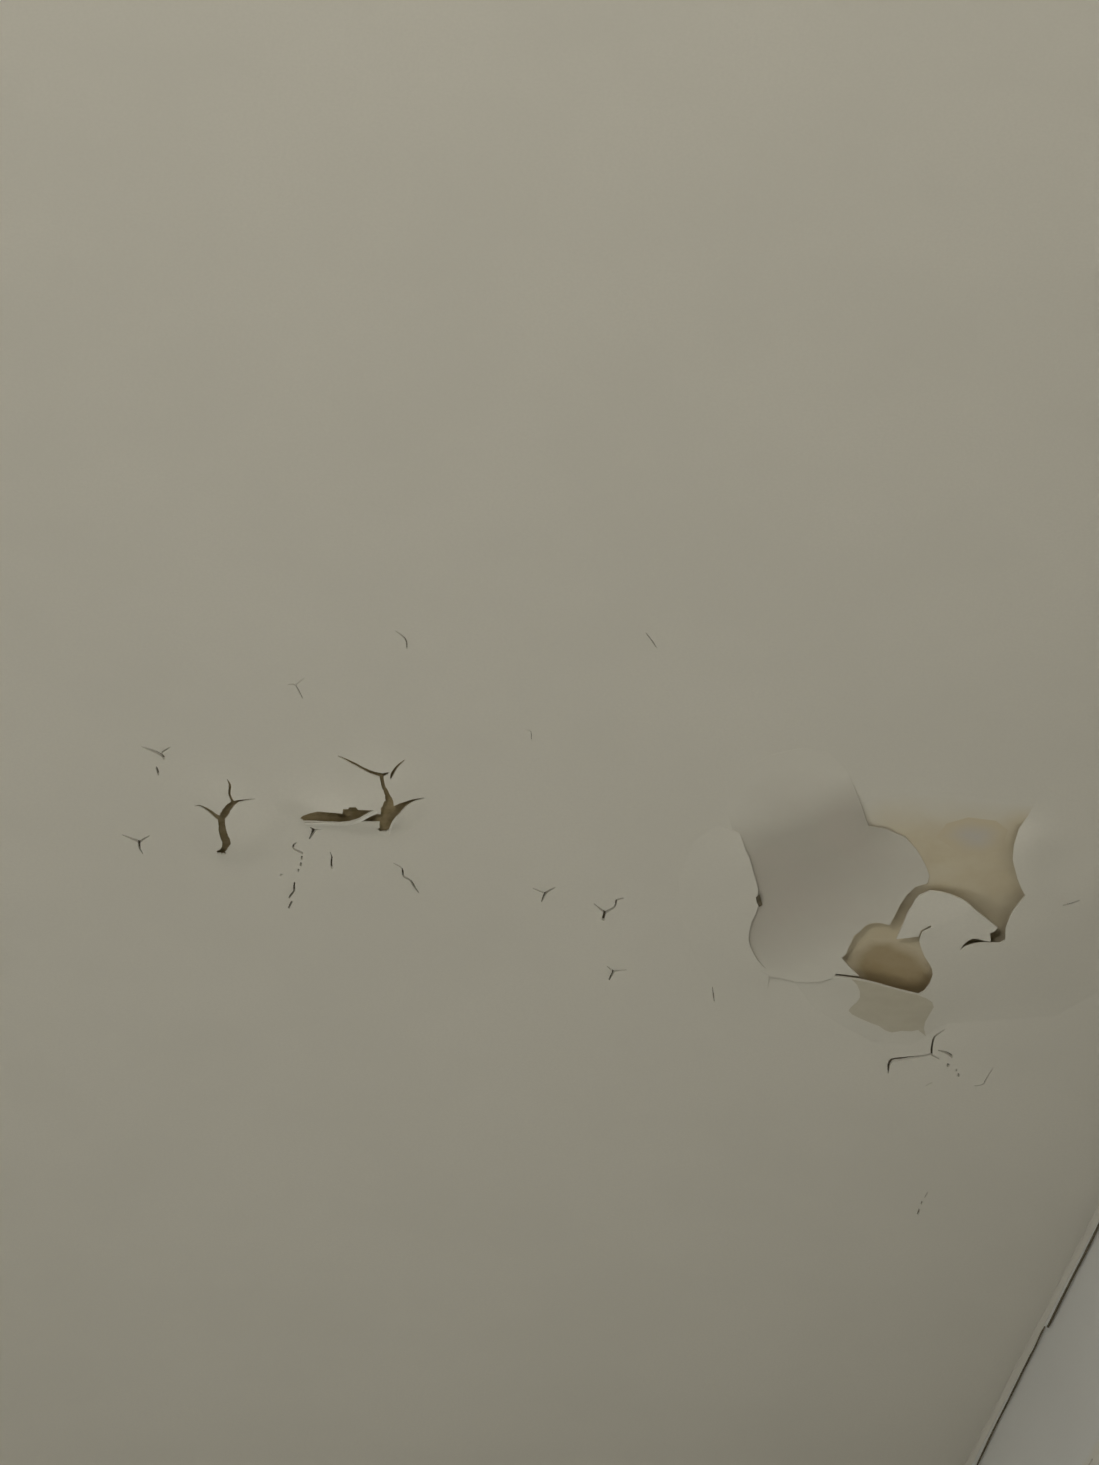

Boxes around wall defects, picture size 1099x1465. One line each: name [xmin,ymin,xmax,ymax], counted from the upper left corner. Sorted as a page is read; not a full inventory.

crack [196,779,249,853]
crack [289,756,421,906]
peeling [678,748,1099,1045]
crack [887,1037,986,1082]
crack [977,1223,1099,1465]